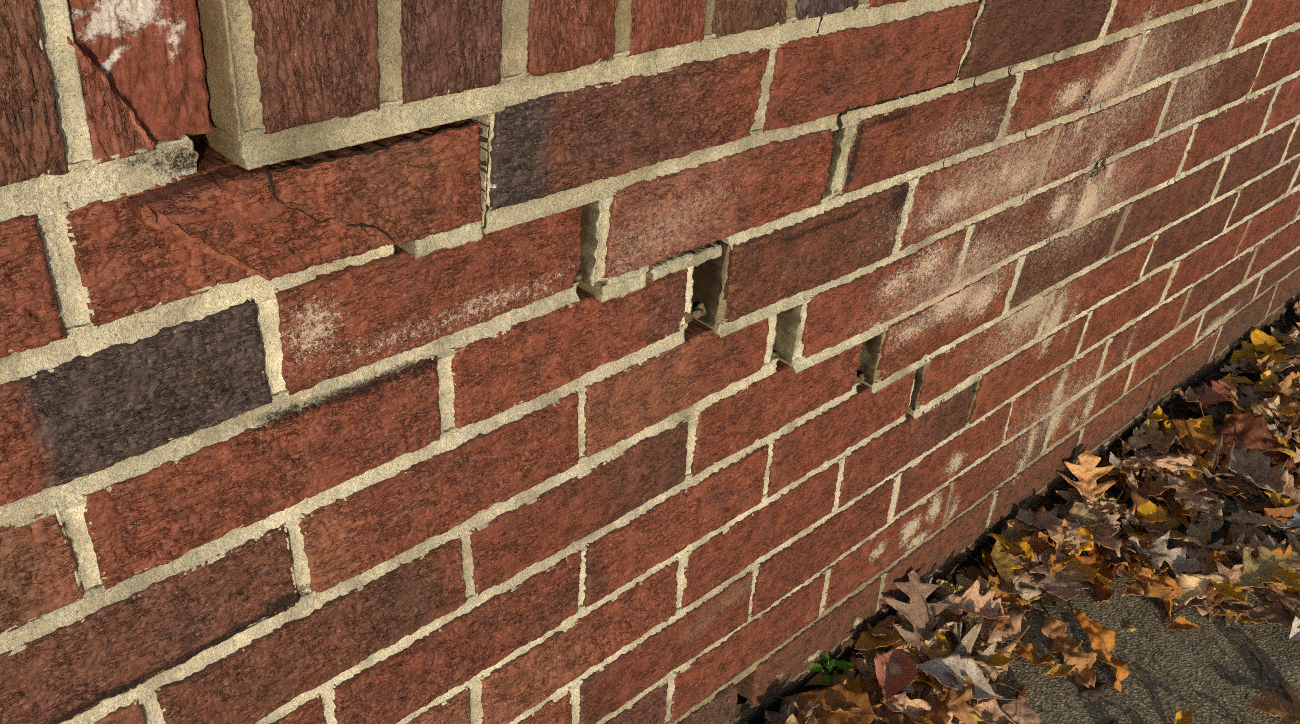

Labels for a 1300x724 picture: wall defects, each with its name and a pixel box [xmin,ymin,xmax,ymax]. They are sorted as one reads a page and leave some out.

damp [69,0,185,74]
spalling [67,0,214,151]
crack [189,134,220,188]
crack [262,122,490,243]
damp [845,0,1240,379]
crack [683,299,706,324]